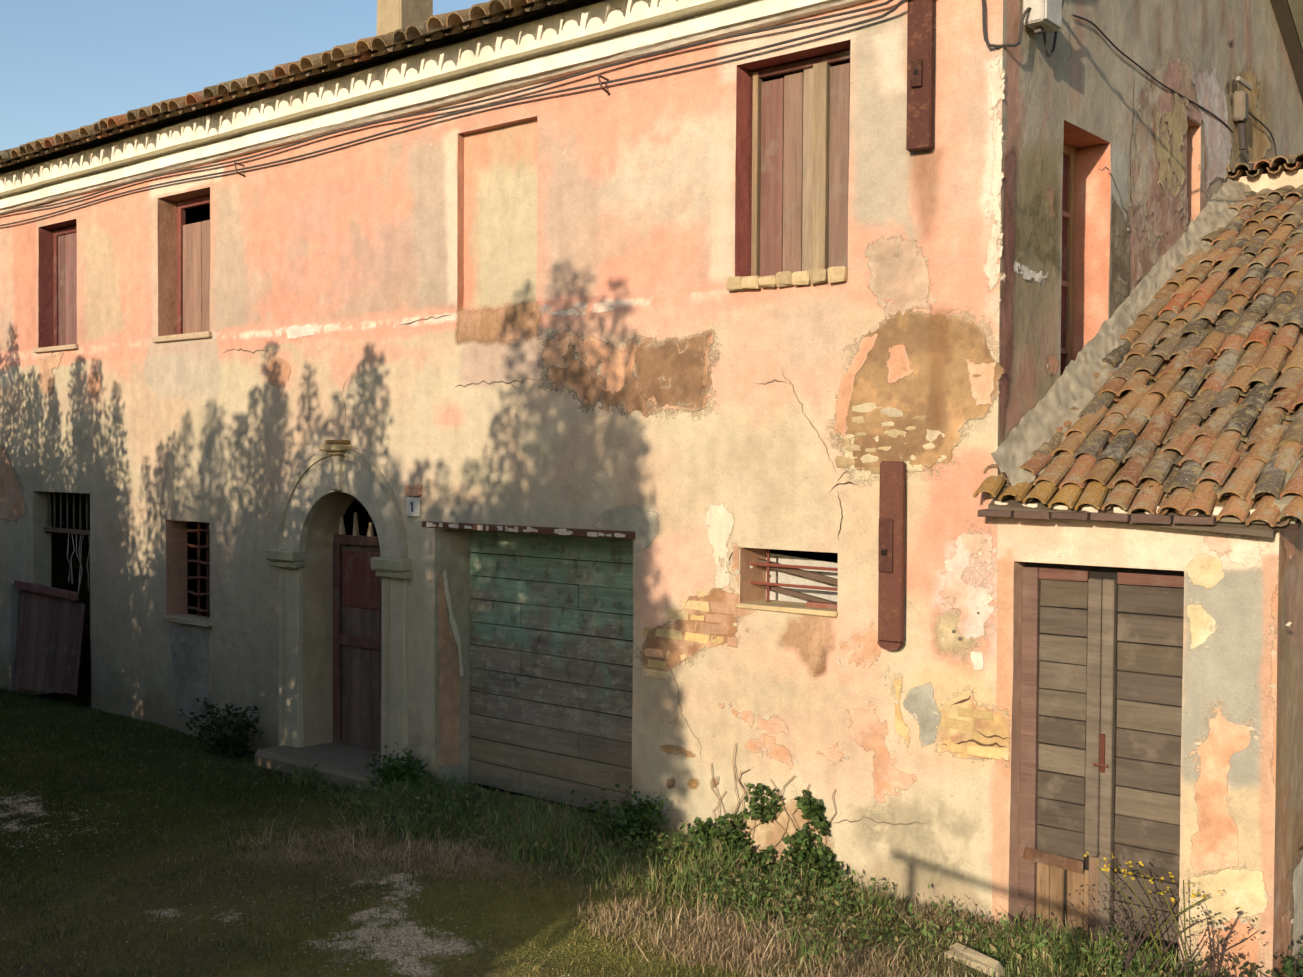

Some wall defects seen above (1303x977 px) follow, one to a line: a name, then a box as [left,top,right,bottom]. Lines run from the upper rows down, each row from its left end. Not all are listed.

peeling [1125,48,1232,295]
peeling [827,53,1005,486]
crack [754,369,858,535]
spalling [635,542,755,680]
peeling [834,618,881,668]
peeling [934,521,1002,671]
peeling [718,702,799,769]
spalling [816,674,1011,803]
peeling [1181,523,1303,977]